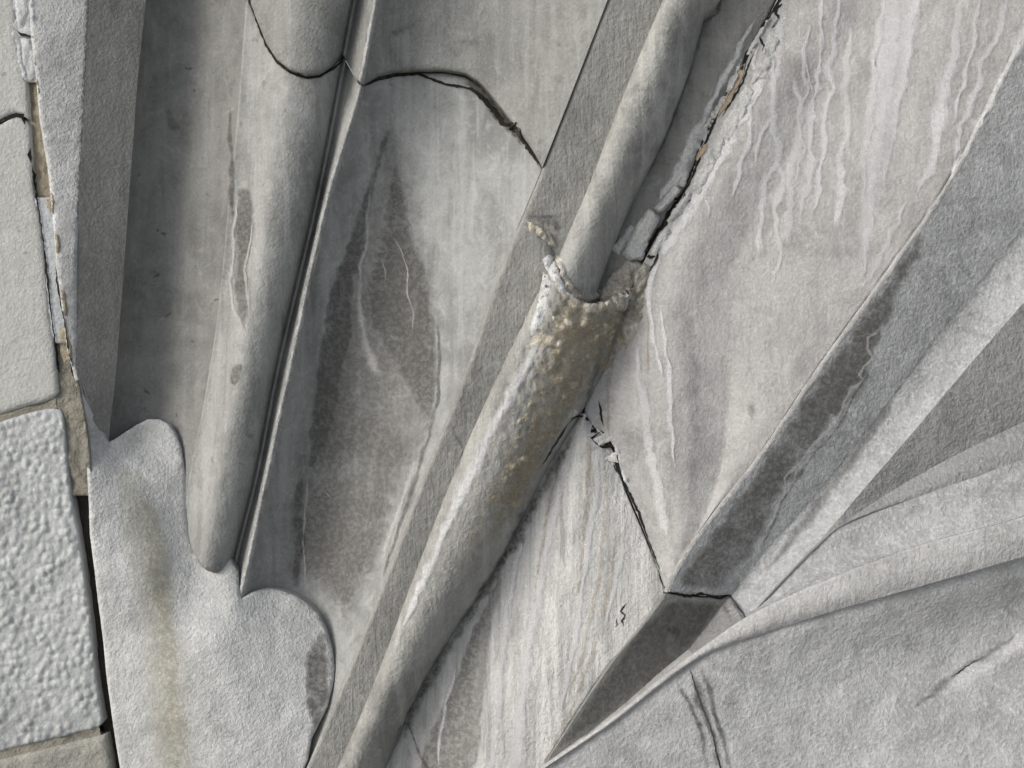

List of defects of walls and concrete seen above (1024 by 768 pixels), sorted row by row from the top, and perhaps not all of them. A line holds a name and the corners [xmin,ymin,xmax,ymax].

crack [248,0,342,79]
crack [363,73,538,165]
peeling [612,17,780,261]
efflorescence [918,2,1024,188]
damp [312,191,441,516]
damp [395,0,852,768]
damp [683,0,920,585]
damp [293,484,373,592]
damp [385,432,430,568]
crack [541,400,730,599]